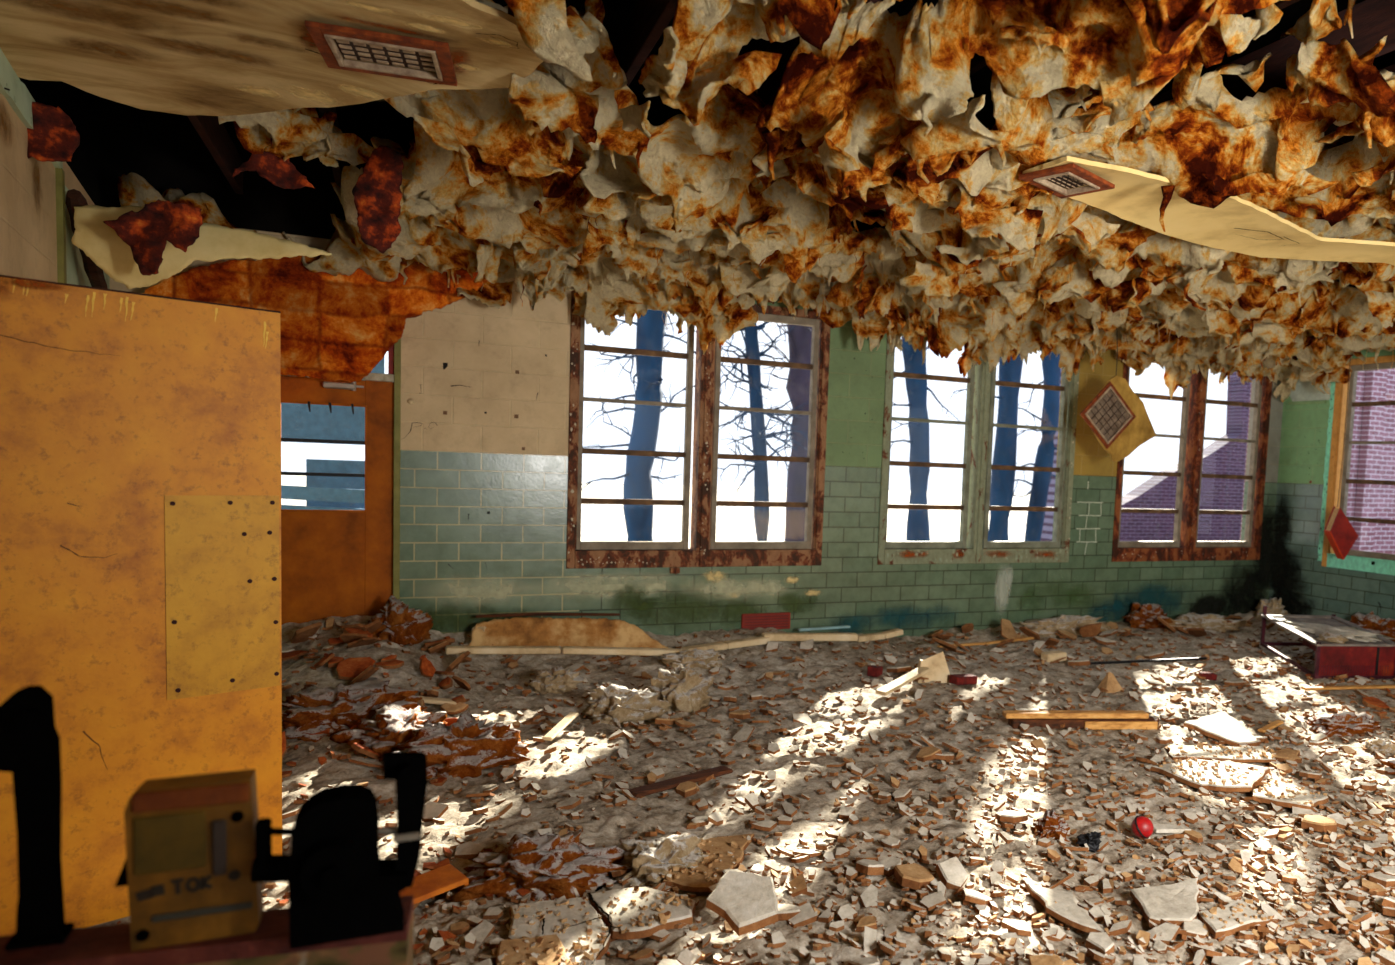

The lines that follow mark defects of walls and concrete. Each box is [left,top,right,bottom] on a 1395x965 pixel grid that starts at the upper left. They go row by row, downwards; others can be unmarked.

damp [1092,499,1312,620]